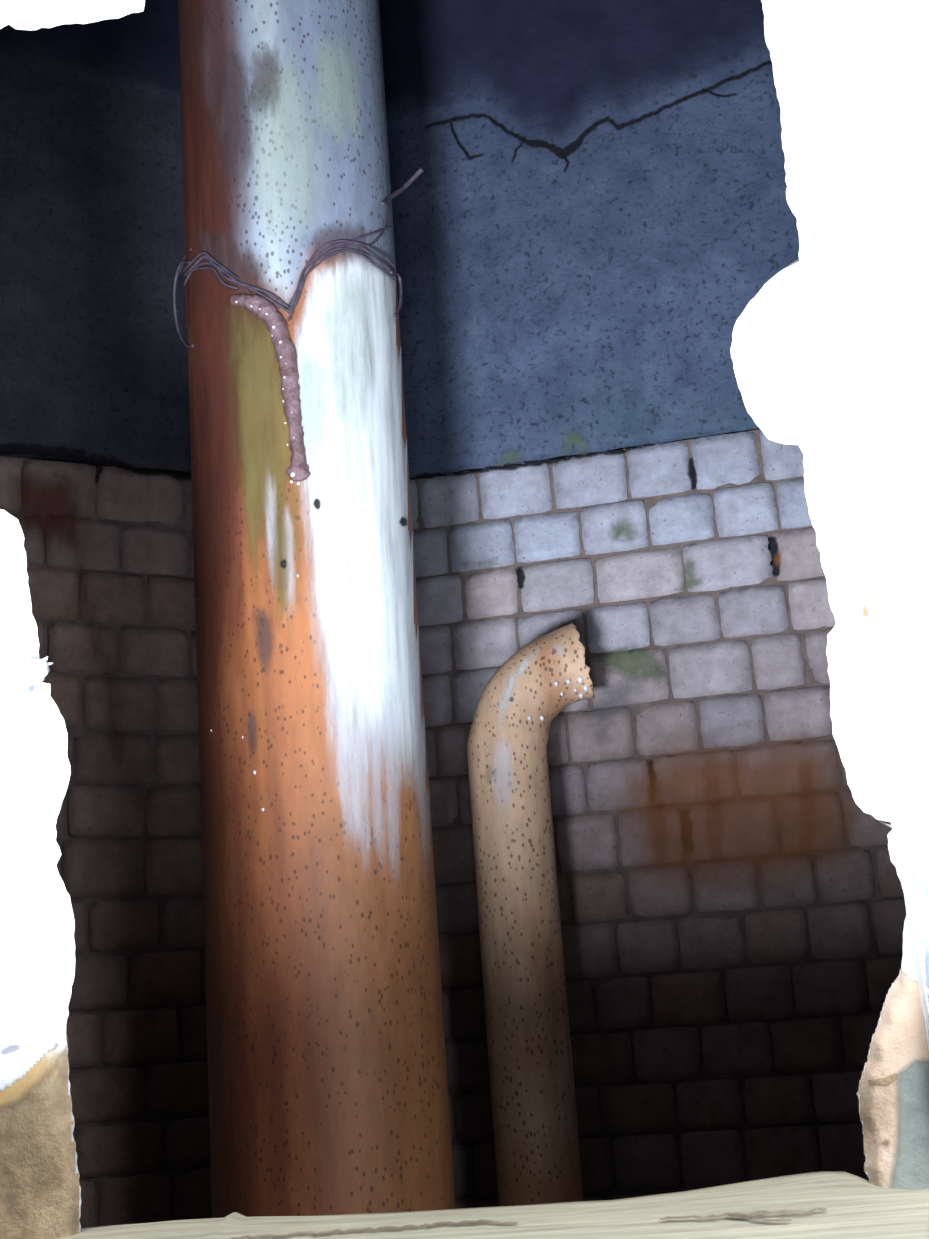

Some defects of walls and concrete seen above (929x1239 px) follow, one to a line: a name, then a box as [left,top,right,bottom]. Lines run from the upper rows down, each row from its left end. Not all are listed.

crack [426,60,772,172]
rust [183,57,277,590]
leakage [297,258,425,770]
peeling [23,657,50,683]
peeling [560,676,589,699]
spalling [0,1039,80,1239]
spalling [857,971,929,1188]